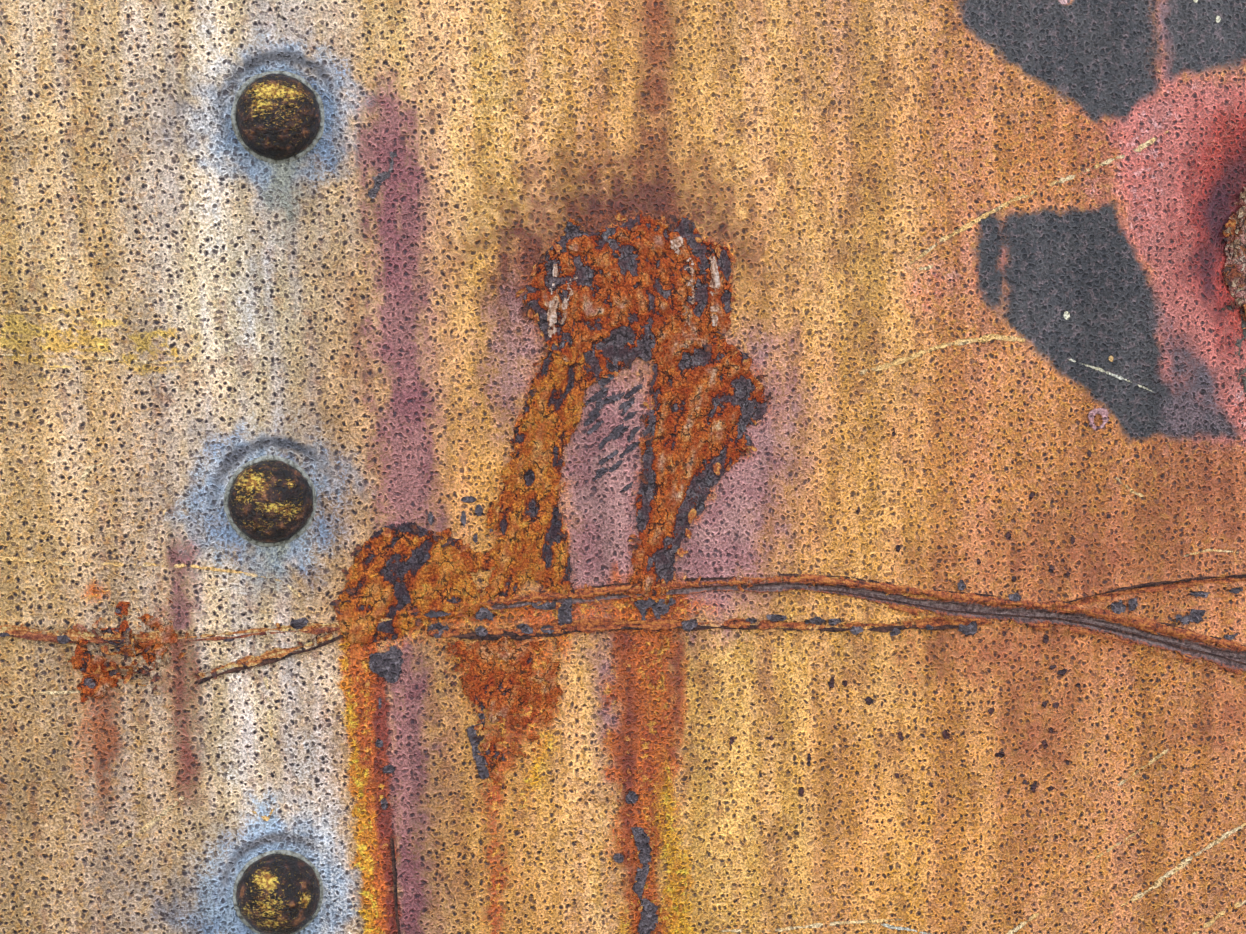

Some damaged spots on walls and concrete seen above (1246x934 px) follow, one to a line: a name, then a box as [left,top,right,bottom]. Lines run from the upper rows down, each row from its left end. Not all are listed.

rust [0,517,221,934]
crack [0,617,344,685]
rust [326,0,848,934]
crack [378,573,1246,675]
rust [792,439,1246,934]